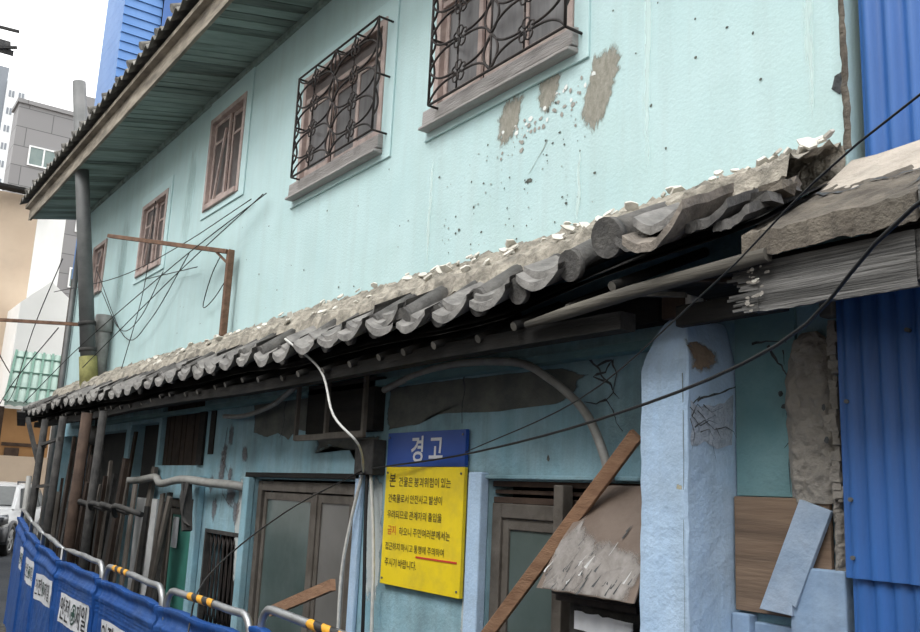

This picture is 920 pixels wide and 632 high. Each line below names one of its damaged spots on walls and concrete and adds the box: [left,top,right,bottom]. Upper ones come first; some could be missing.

peeling [478,71,596,194]
spalling [52,129,846,396]
peeling [254,398,308,440]
peeling [387,368,585,429]
crack [586,359,623,432]
crack [682,373,736,490]
crack [752,340,787,375]
peeling [233,479,243,580]